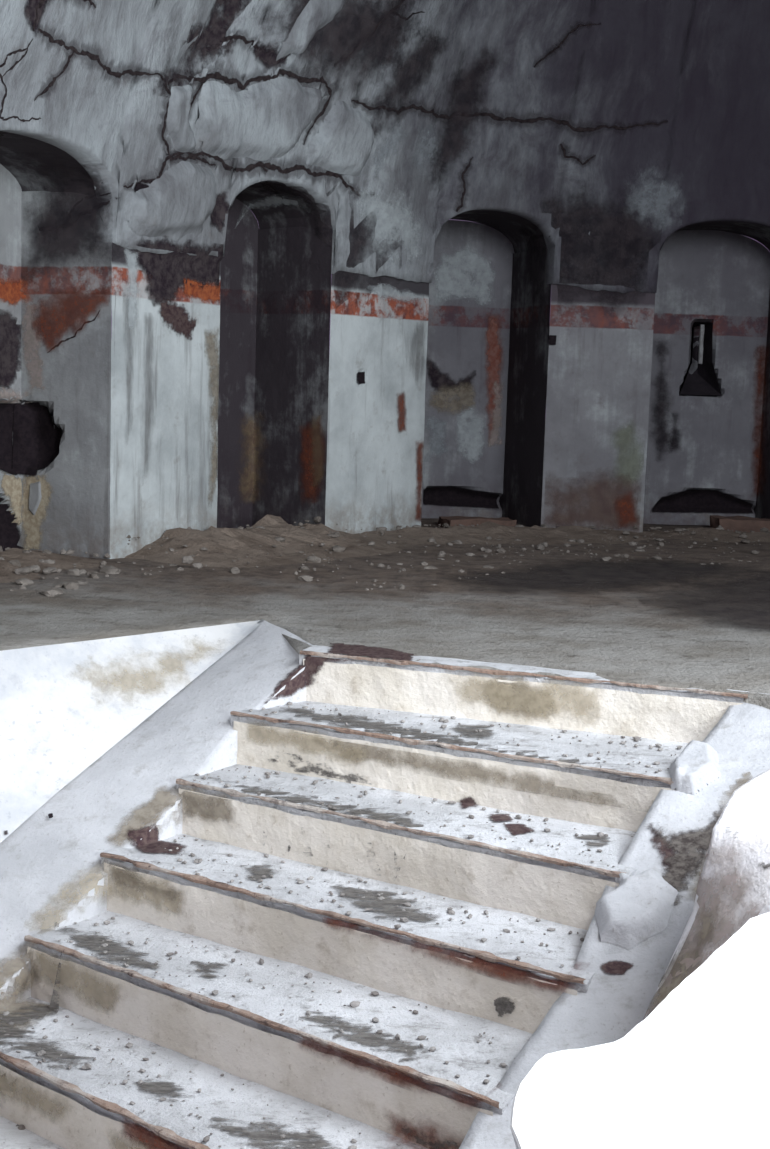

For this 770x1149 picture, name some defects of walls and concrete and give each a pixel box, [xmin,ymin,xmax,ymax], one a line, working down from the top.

crack [0,0,668,212]
rust [0,279,110,349]
spalling [0,305,61,550]
spalling [668,740,721,795]
spalling [595,808,760,1016]
rust [124,1123,185,1149]